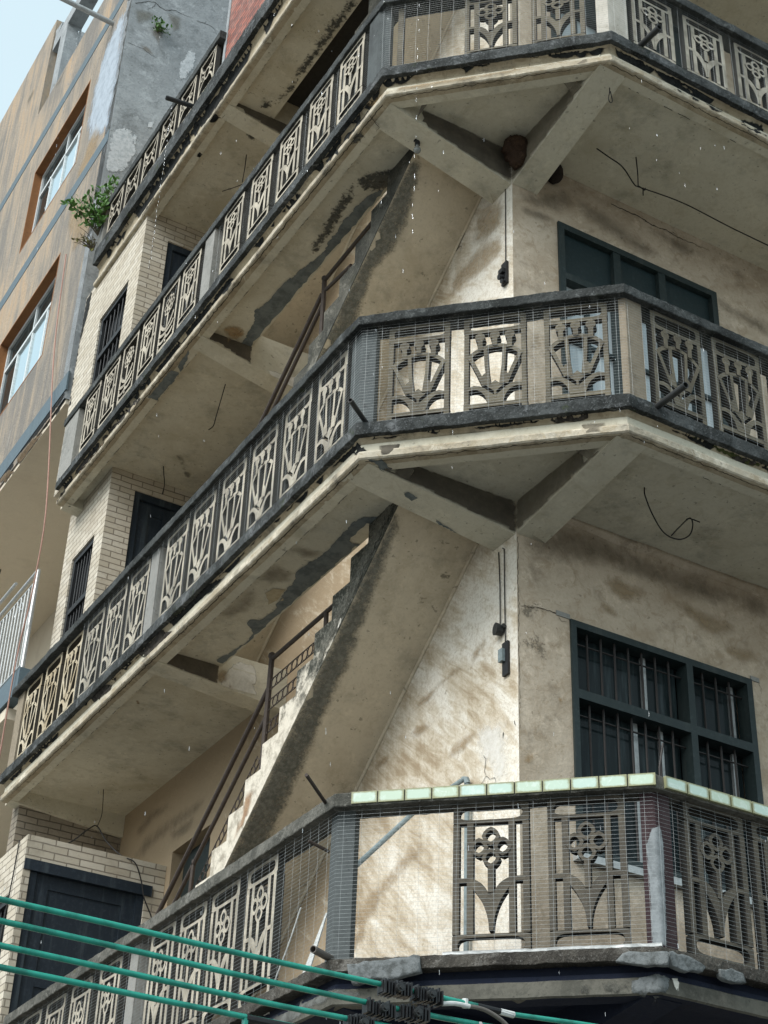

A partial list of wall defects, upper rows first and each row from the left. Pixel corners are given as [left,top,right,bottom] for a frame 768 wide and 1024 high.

damp [312,168,394,254]
peeling [217,517,377,695]